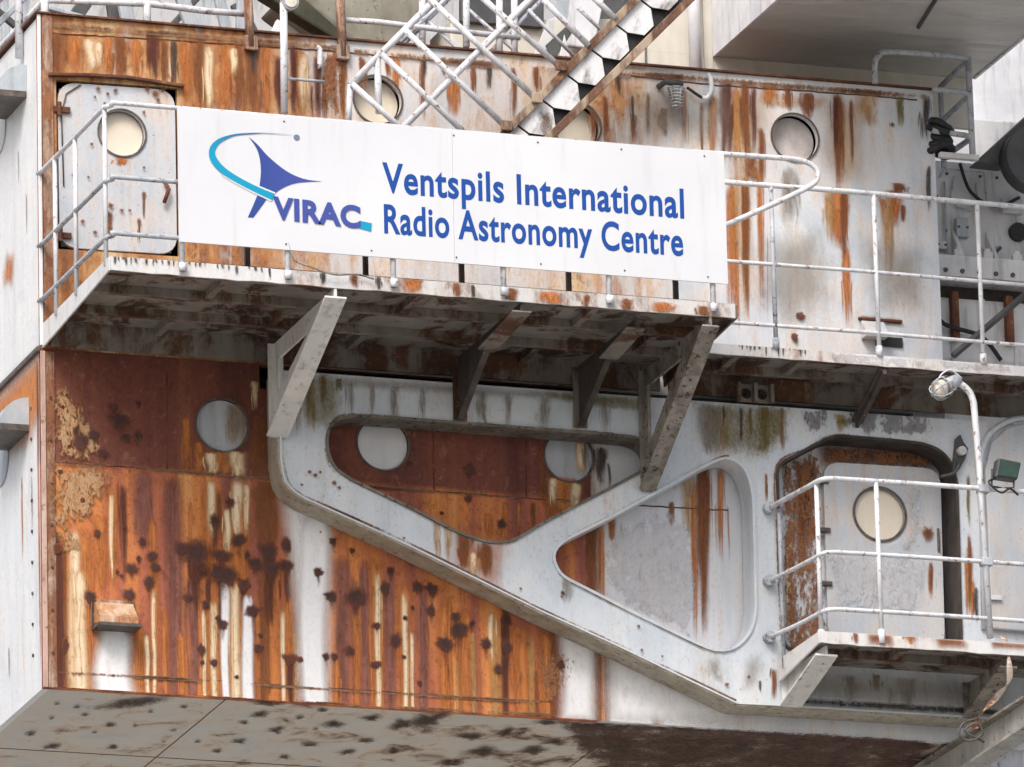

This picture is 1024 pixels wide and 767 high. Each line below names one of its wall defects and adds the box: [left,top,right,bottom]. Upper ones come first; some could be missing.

corrosion [53,22,376,116]
corrosion [386,53,517,113]
corrosion [533,67,555,90]
corrosion [615,71,930,324]
corrosion [404,279,422,292]
corrosion [453,283,475,297]
peeling [48,383,111,553]
corrosion [53,381,574,718]
corrosion [284,429,626,648]
corrosion [691,455,729,625]
mould [705,405,784,452]
corrosion [765,417,934,649]